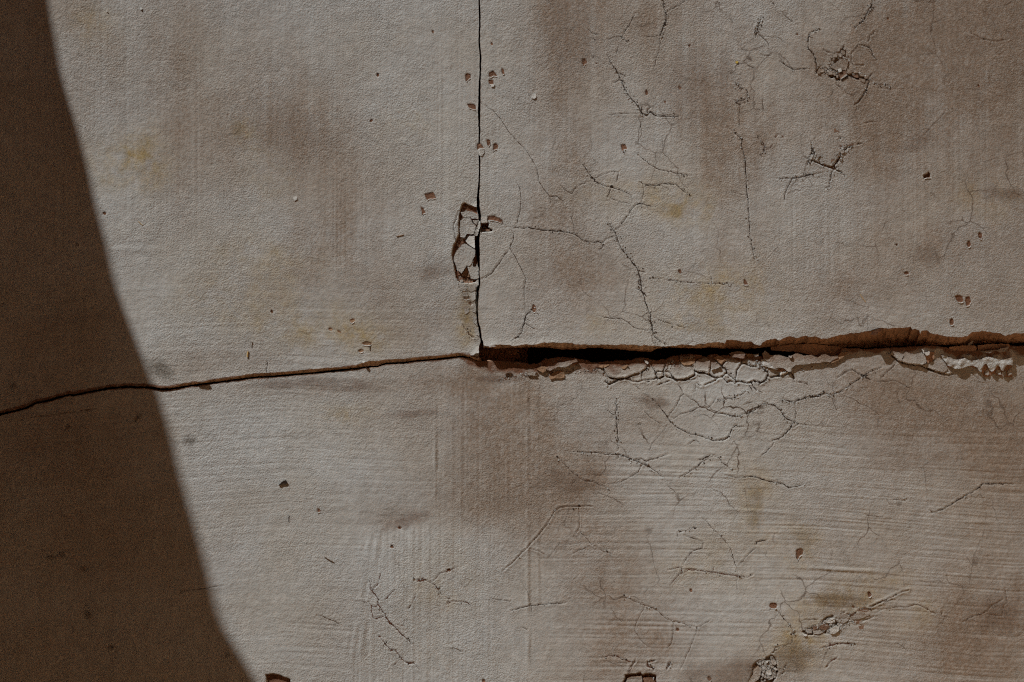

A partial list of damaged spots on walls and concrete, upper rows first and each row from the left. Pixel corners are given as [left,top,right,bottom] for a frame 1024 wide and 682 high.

flaking render [452,200,503,337]
crack [0,0,1024,492]
crack [502,505,610,572]
crack [671,523,766,585]
crack [362,567,563,670]
crack [601,594,708,673]
flaking render [749,644,788,682]
flaking render [793,592,890,636]
crack [874,590,1007,621]